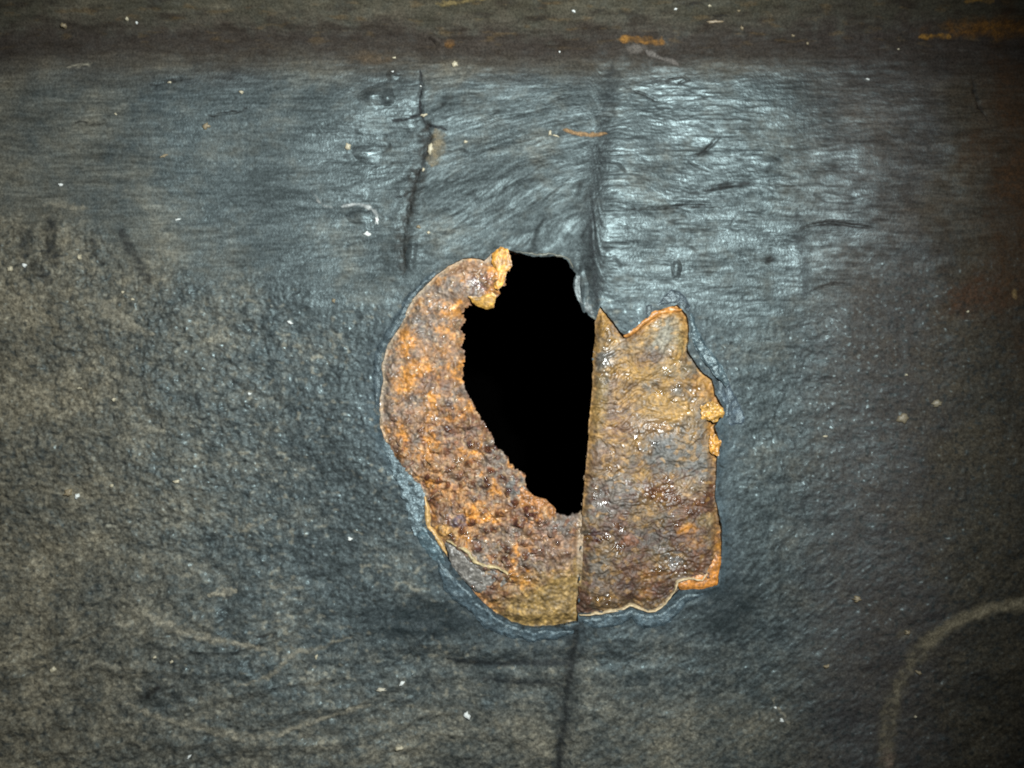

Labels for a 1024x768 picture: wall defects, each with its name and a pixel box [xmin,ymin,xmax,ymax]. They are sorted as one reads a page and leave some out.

crack [392,71,447,210]
peeling [515,251,594,316]
rust [380,247,725,626]